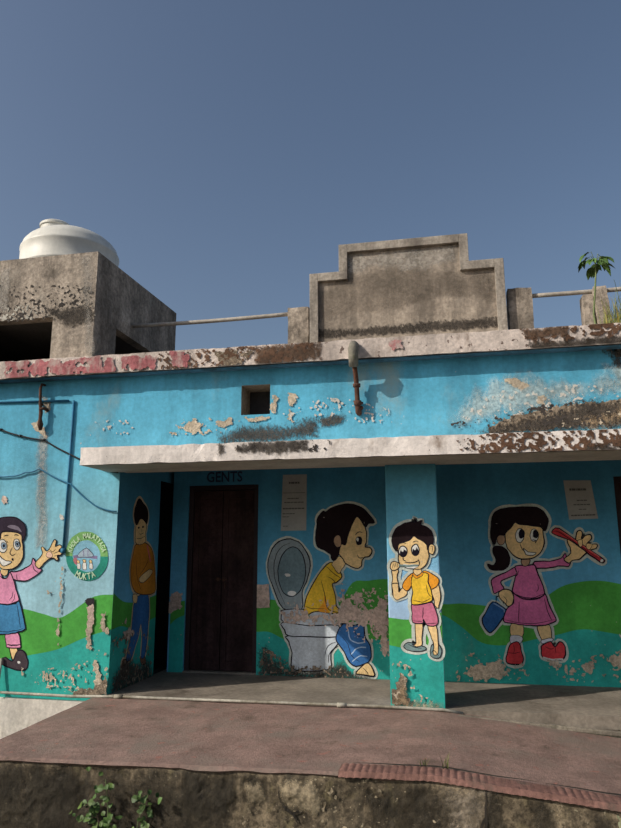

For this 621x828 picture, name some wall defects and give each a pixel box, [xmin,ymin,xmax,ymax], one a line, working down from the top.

peeling [169,417,233,437]
peeling [244,393,395,423]
spalling [451,399,621,433]